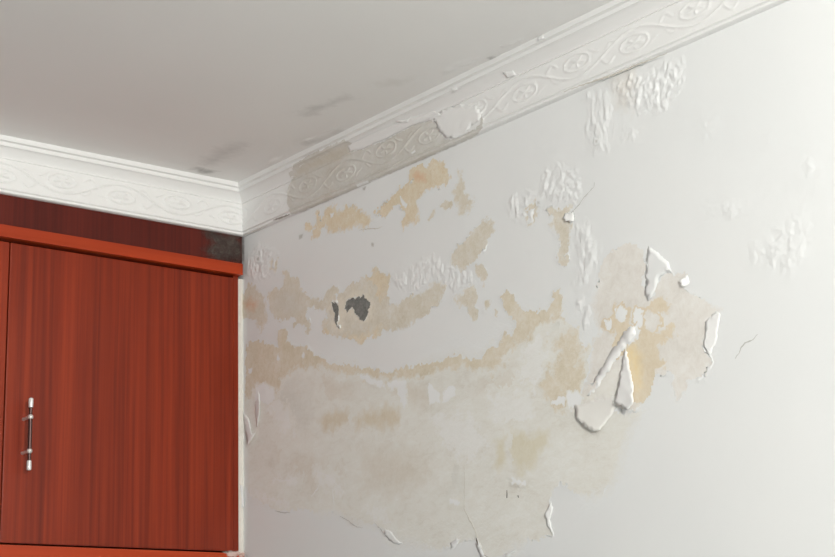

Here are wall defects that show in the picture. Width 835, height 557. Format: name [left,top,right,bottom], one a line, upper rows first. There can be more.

peeling [242,104,728,557]